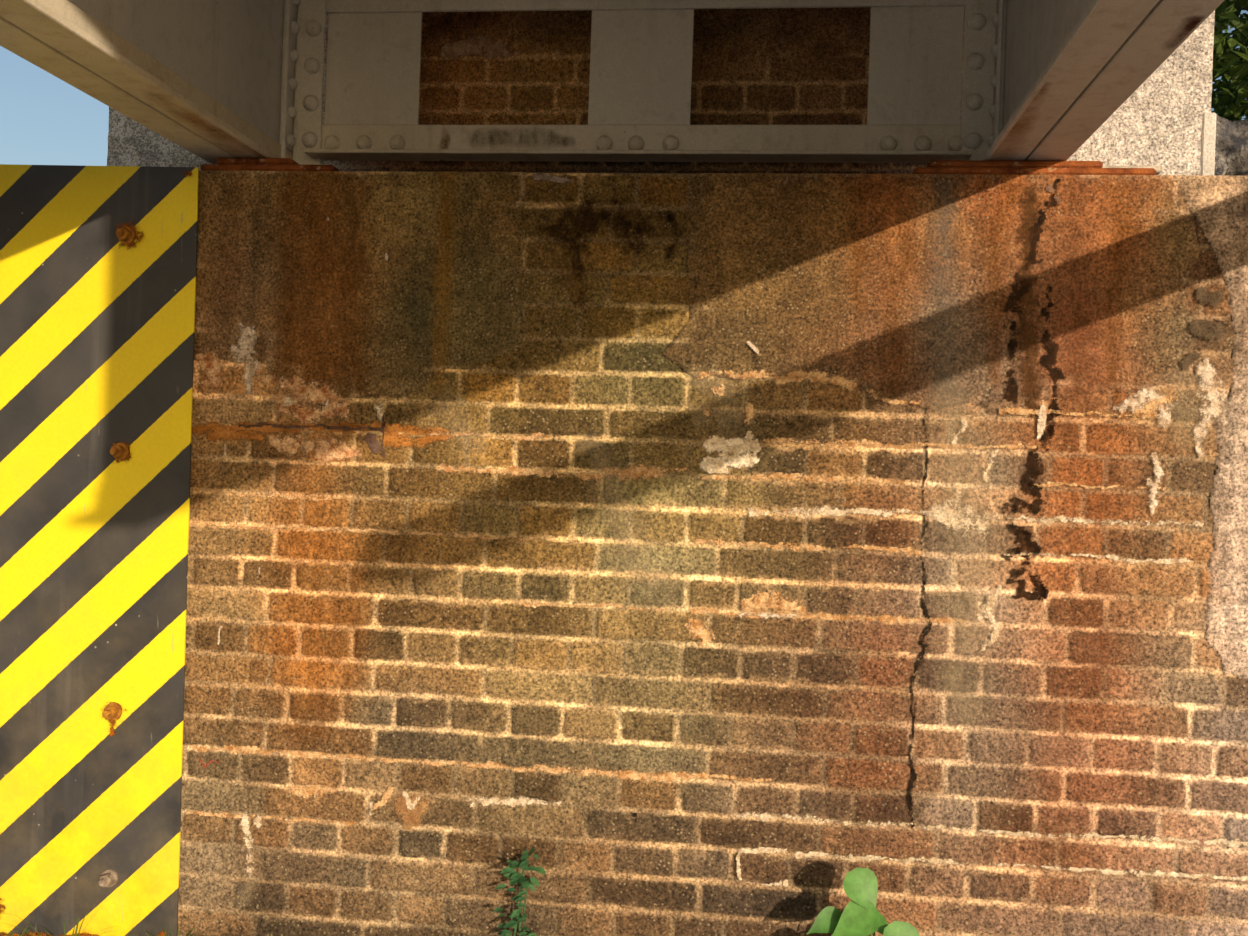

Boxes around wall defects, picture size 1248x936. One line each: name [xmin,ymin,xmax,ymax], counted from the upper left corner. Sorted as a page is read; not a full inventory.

corrosion [192,414,455,458]
water stain [543,199,652,302]
crack [906,398,932,829]
peeling [661,173,1248,679]
crack [1001,179,1065,601]